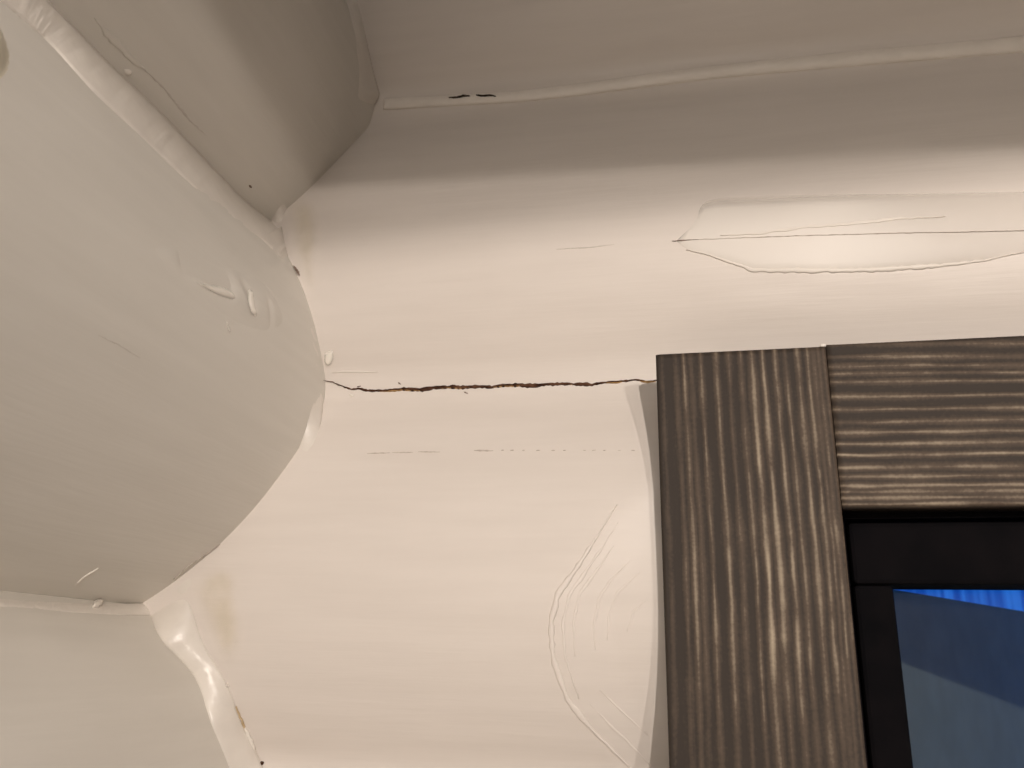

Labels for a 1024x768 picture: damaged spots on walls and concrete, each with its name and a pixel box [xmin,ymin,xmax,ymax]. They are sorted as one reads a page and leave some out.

crack [449,92,496,100]
crack [324,370,657,397]